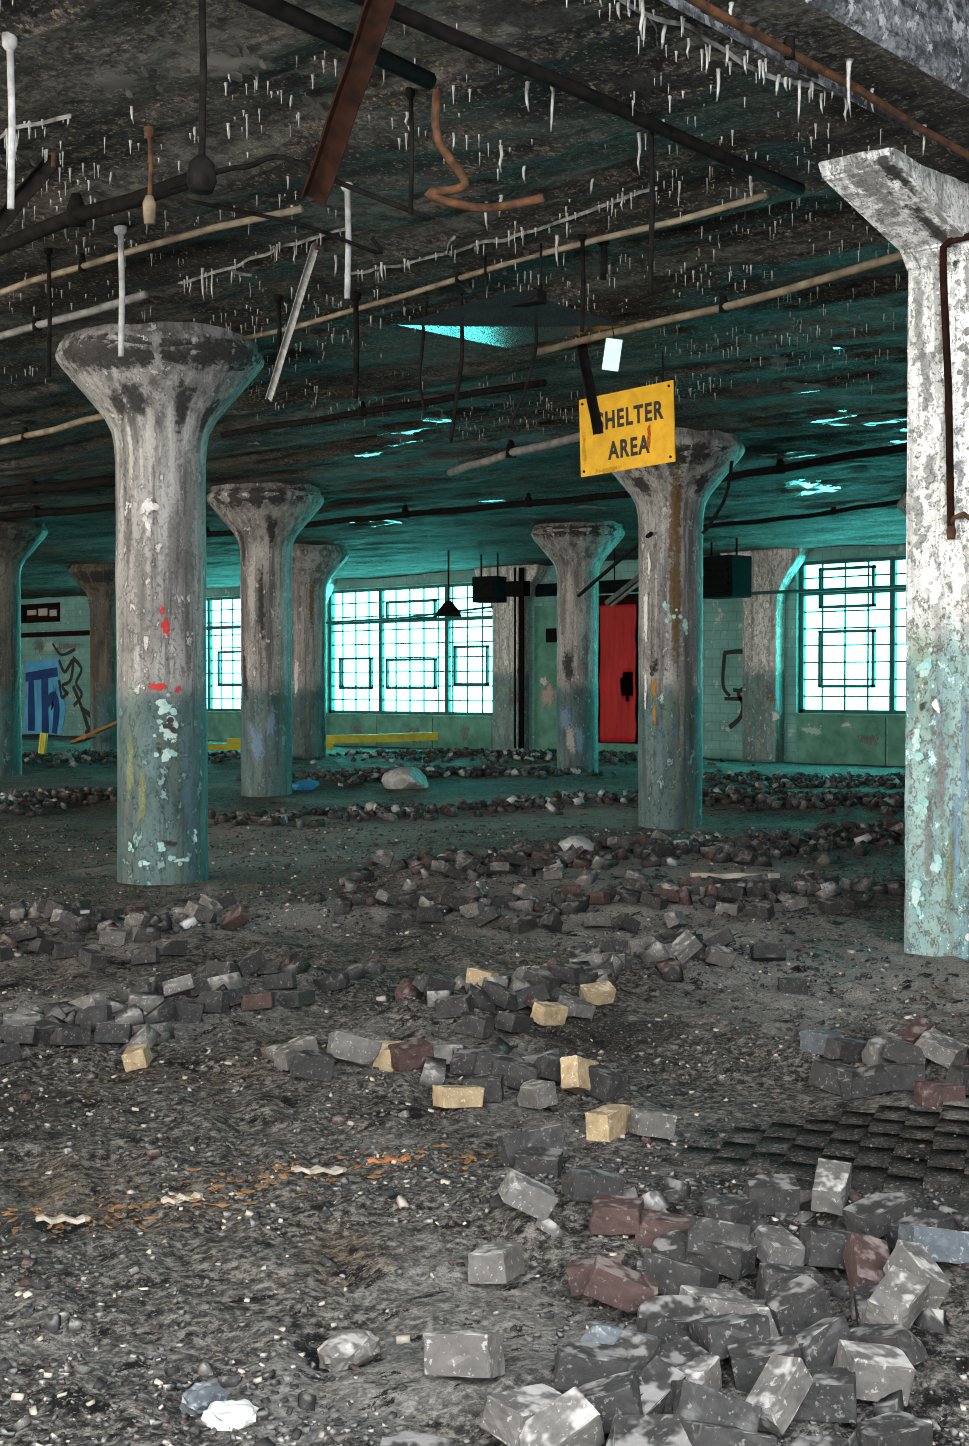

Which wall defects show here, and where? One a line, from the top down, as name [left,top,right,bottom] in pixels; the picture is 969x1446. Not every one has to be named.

damp [464,0,588,32]
damp [594,70,683,96]
peeling [913,212,969,617]
peeling [916,658,932,678]
peeling [153,693,178,762]
peeling [911,699,940,761]
peeling [914,797,930,822]
peeling [128,829,197,867]
peeling [910,855,943,915]